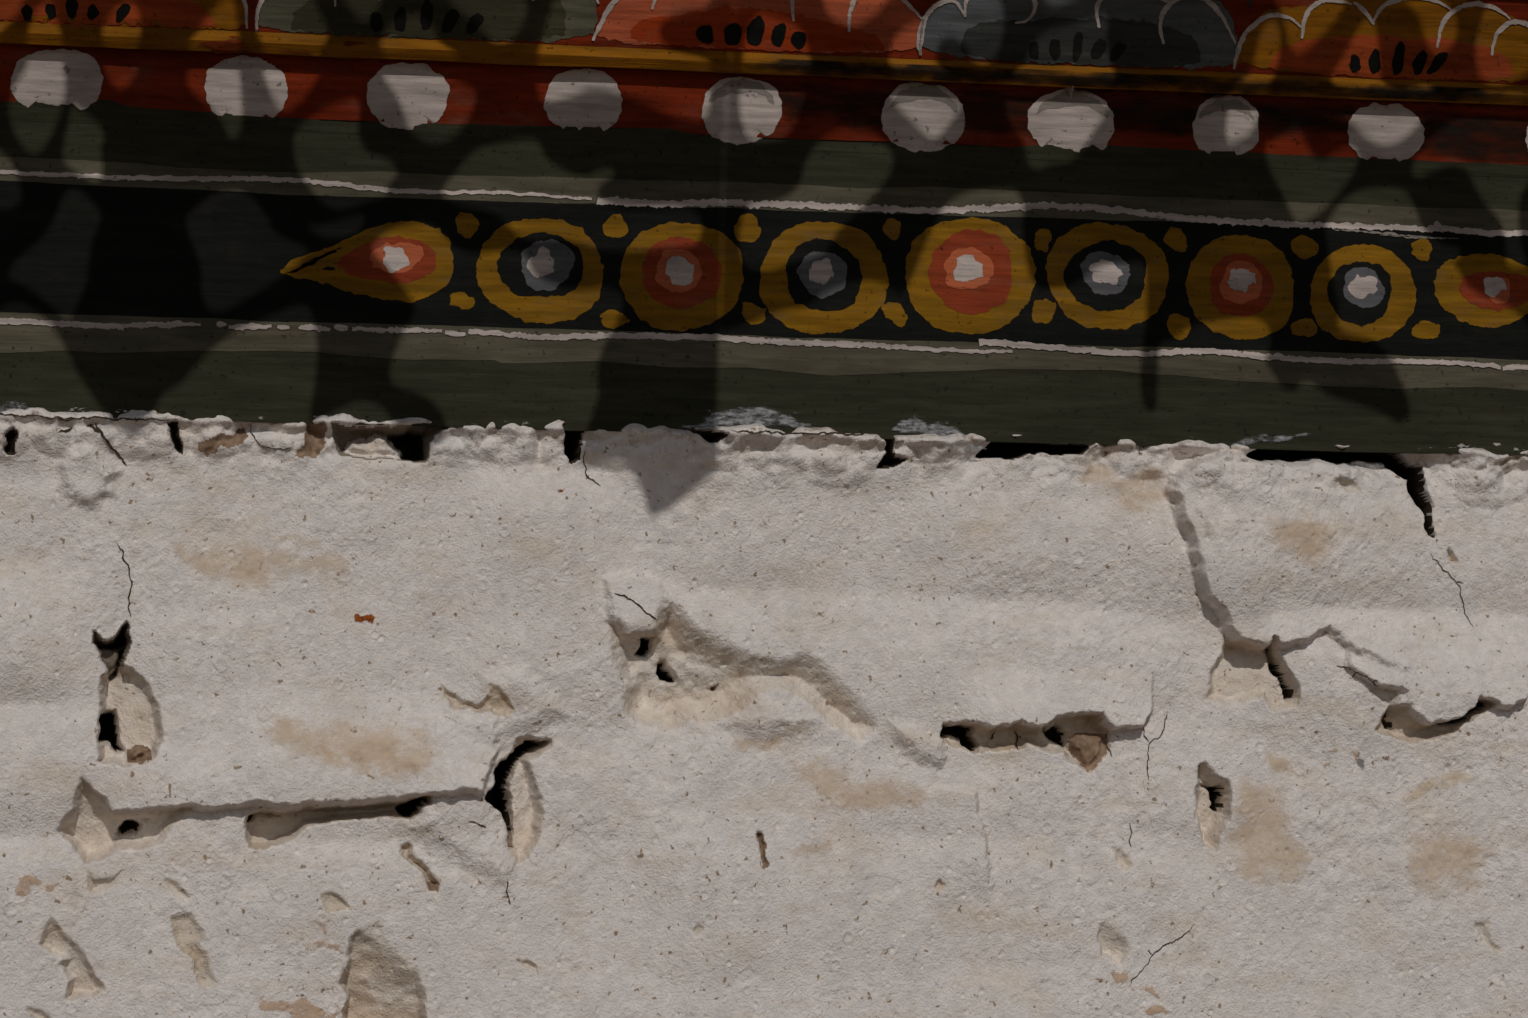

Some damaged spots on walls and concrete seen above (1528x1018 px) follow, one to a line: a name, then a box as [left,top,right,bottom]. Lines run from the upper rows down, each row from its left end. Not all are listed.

peeling [198,427,248,457]
spalling [295,422,450,463]
peeling [1334,477,1363,495]
spalling [93,622,132,674]
spalling [609,601,875,741]
spalling [1370,687,1402,707]
spalling [940,715,1111,773]
spalling [59,778,197,894]
spalling [1195,764,1232,852]
spalling [41,917,106,1002]
spalling [259,892,427,1018]
spalling [1097,918,1169,1014]